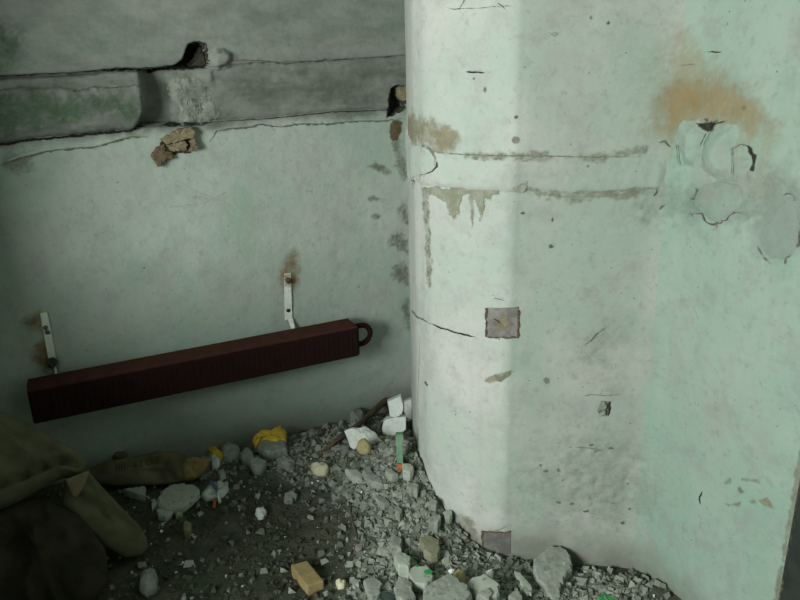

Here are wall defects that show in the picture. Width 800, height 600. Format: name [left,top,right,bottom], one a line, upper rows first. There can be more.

crack [234,55,405,65]
crack [0,63,187,92]
crack [0,126,143,146]
crack [163,120,209,128]
spalling [147,41,406,167]
crack [228,107,406,121]
peeling [424,186,499,221]
crack [411,311,474,337]